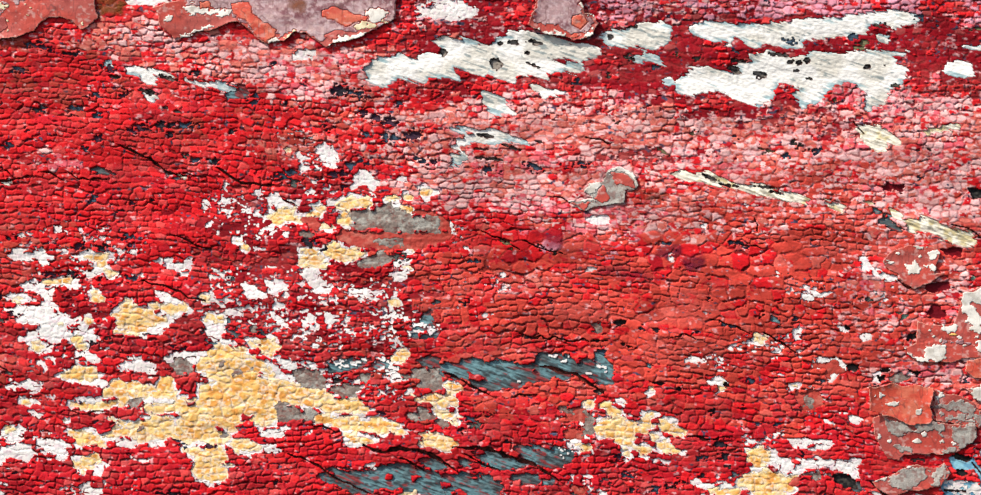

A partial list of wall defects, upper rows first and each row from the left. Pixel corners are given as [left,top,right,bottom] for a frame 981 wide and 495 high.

peeling [0,0,98,57]
peeling [125,0,396,61]
peeling [330,0,924,144]
crack [0,166,117,186]
crack [121,145,295,204]
spalling [0,122,981,495]
crack [289,453,369,493]
crack [363,444,558,479]